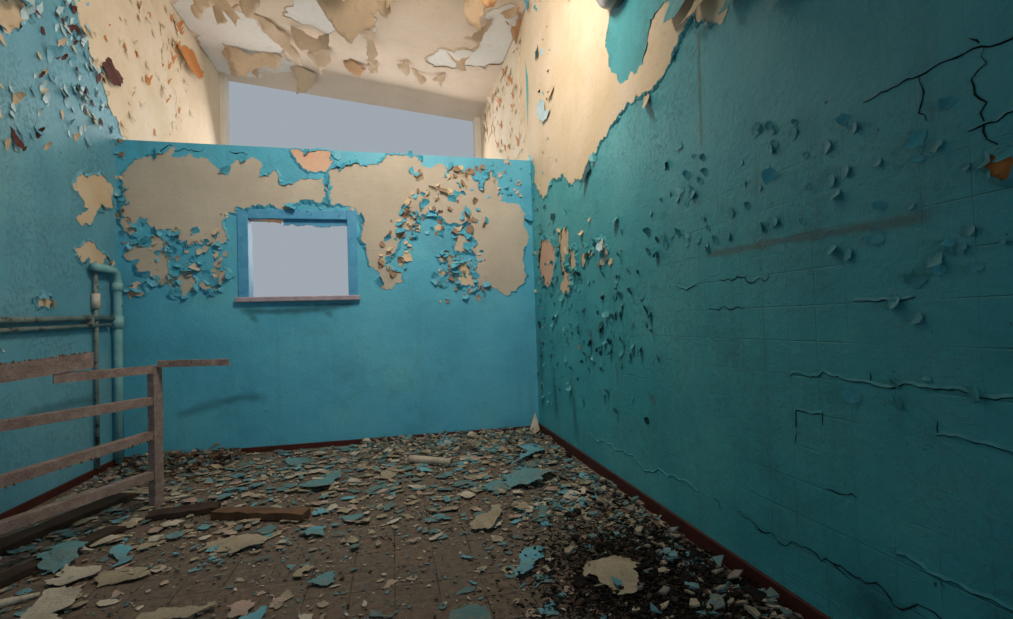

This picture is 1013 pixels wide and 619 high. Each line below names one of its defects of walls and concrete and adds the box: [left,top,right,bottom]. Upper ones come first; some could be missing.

crack [863,34,1013,146]
peeling [976,144,1013,187]
crack [789,369,1013,401]
crack [935,420,1013,453]
crack [590,432,941,619]
crack [896,551,1013,611]